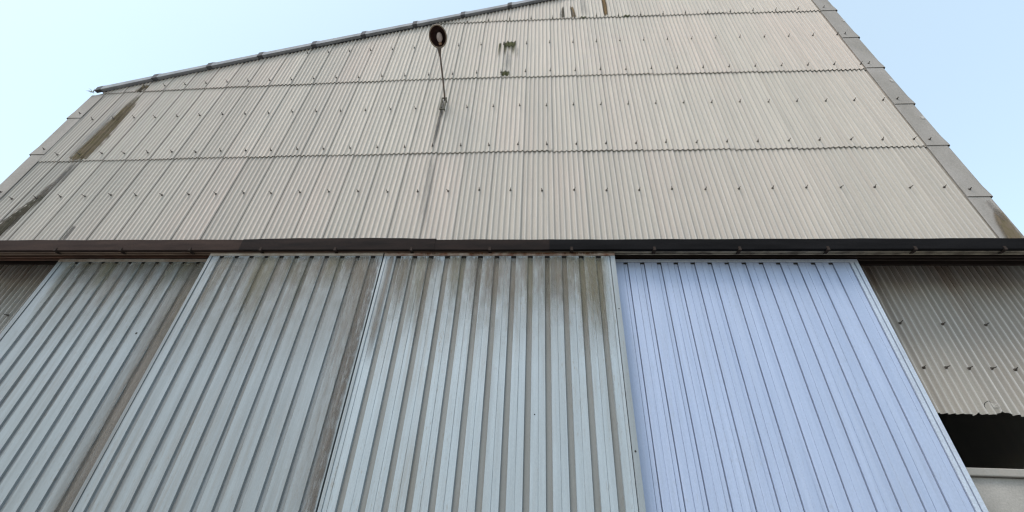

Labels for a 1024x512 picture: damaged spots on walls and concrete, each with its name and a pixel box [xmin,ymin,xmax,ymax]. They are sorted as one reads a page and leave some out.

damp [0,85,149,235]
damp [54,262,201,512]
damp [307,256,394,512]